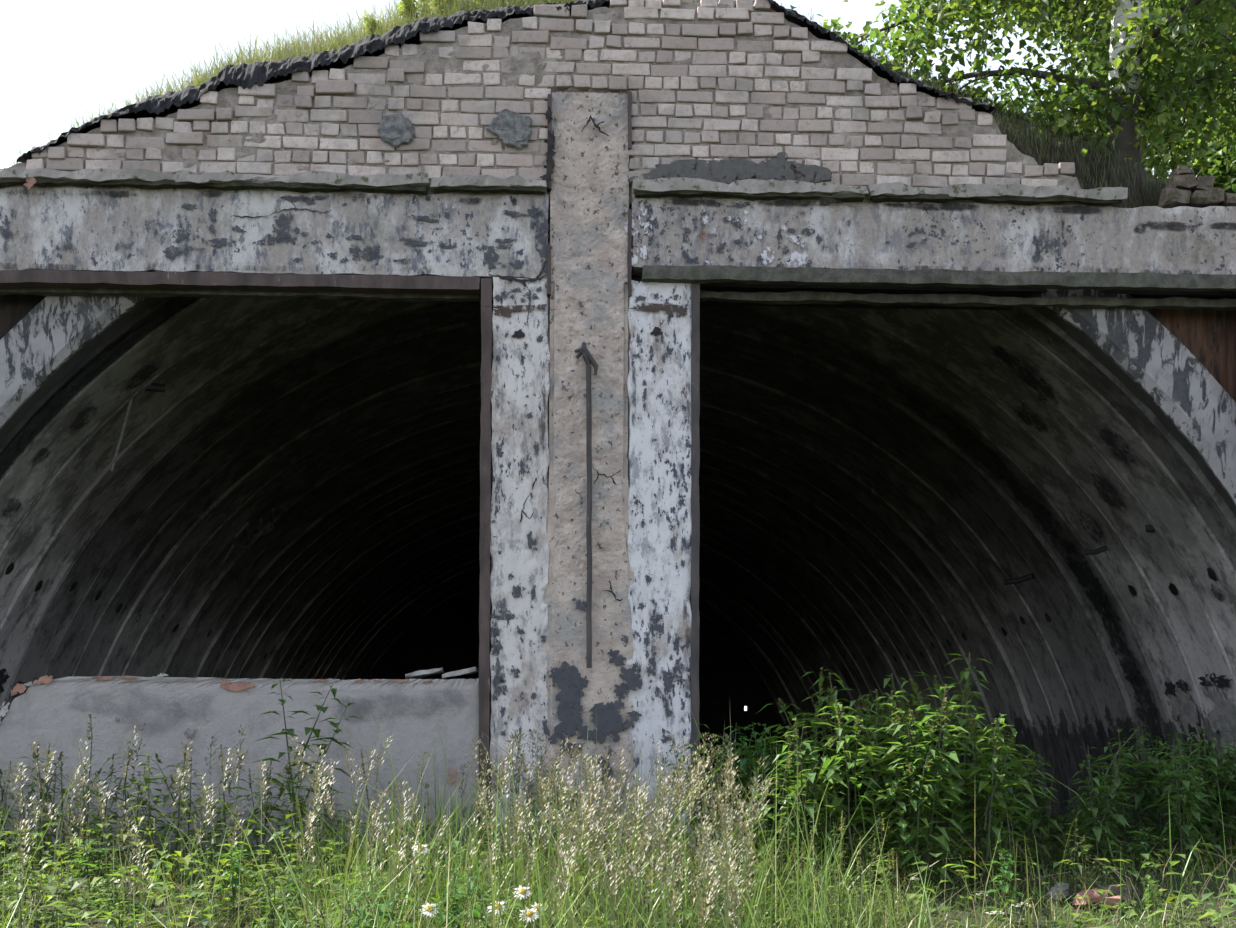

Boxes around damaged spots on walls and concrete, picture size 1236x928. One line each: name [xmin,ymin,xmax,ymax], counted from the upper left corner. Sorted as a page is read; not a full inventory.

crack [582,115,609,136]
peeling [163,195,457,264]
peeling [624,200,822,267]
peeling [902,219,937,247]
peeling [1032,225,1072,271]
peeling [629,293,687,318]
peeling [632,328,679,419]
peeling [501,391,540,474]
peeling [651,425,685,548]